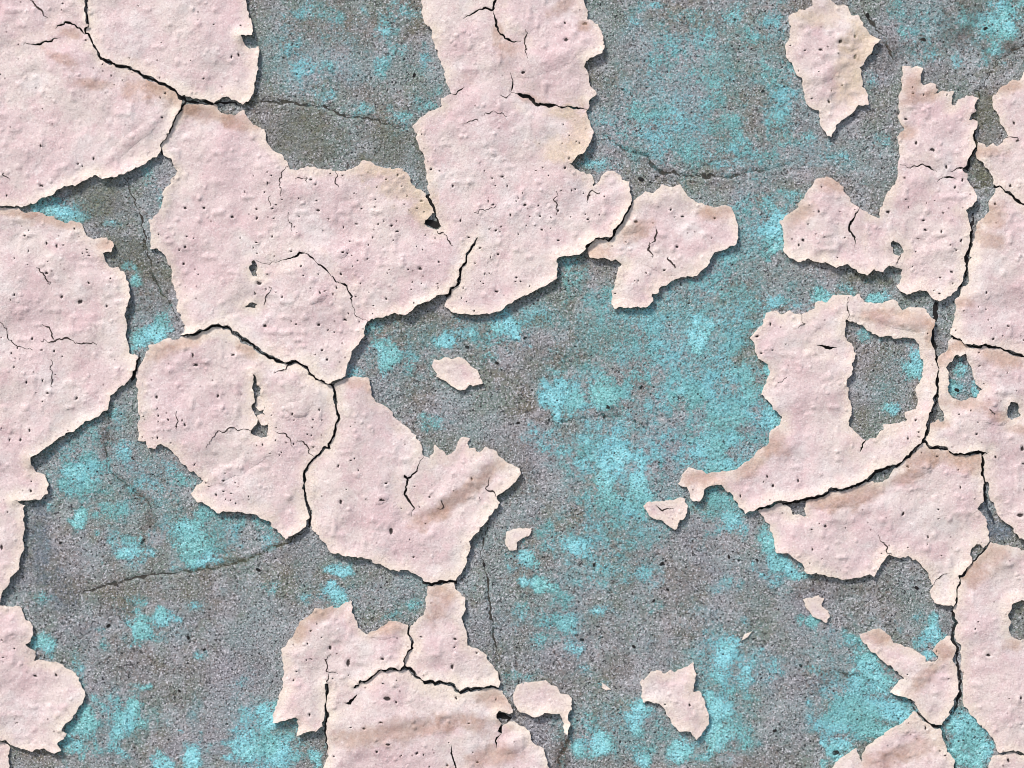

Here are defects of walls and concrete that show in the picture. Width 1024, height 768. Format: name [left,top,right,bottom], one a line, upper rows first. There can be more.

crack [26,0,412,155]
crack [466,0,790,183]
peeling [785,0,881,137]
crack [911,45,1024,205]
crack [258,252,369,322]
crack [959,213,974,287]
crack [81,178,340,594]
peeling [0,0,738,768]
peeling [643,66,1024,768]
crack [324,479,511,750]
crack [757,302,1024,768]